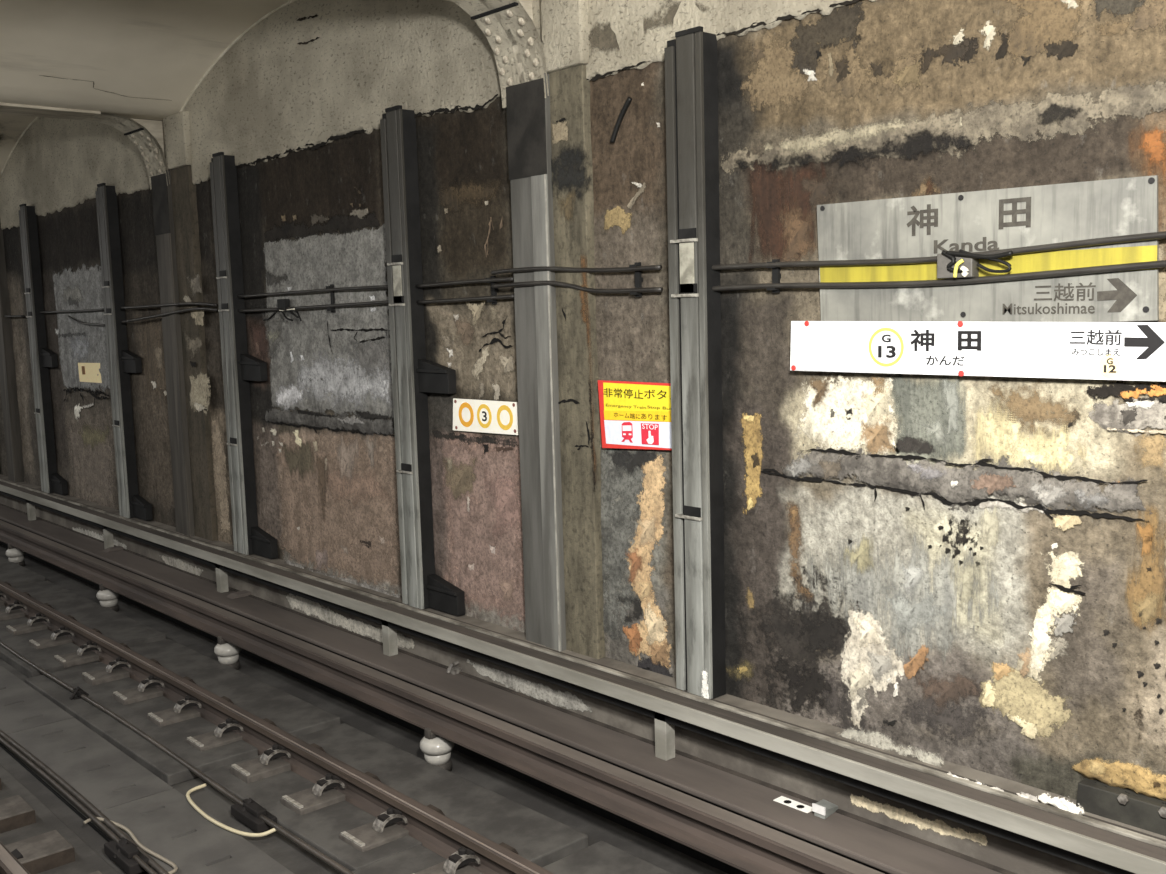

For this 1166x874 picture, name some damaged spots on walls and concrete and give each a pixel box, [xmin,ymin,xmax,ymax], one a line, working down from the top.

damp [588,23,620,51]
damp [643,0,681,33]
peeling [979,0,1150,66]
corrosion [1129,127,1166,176]
corrosion [1158,246,1166,321]
peeling [183,274,233,538]
peeling [795,375,901,456]
crack [760,448,1149,522]
peeling [979,498,1082,547]
peeling [623,455,672,668]
peeling [840,609,929,729]
peeling [978,543,1084,741]